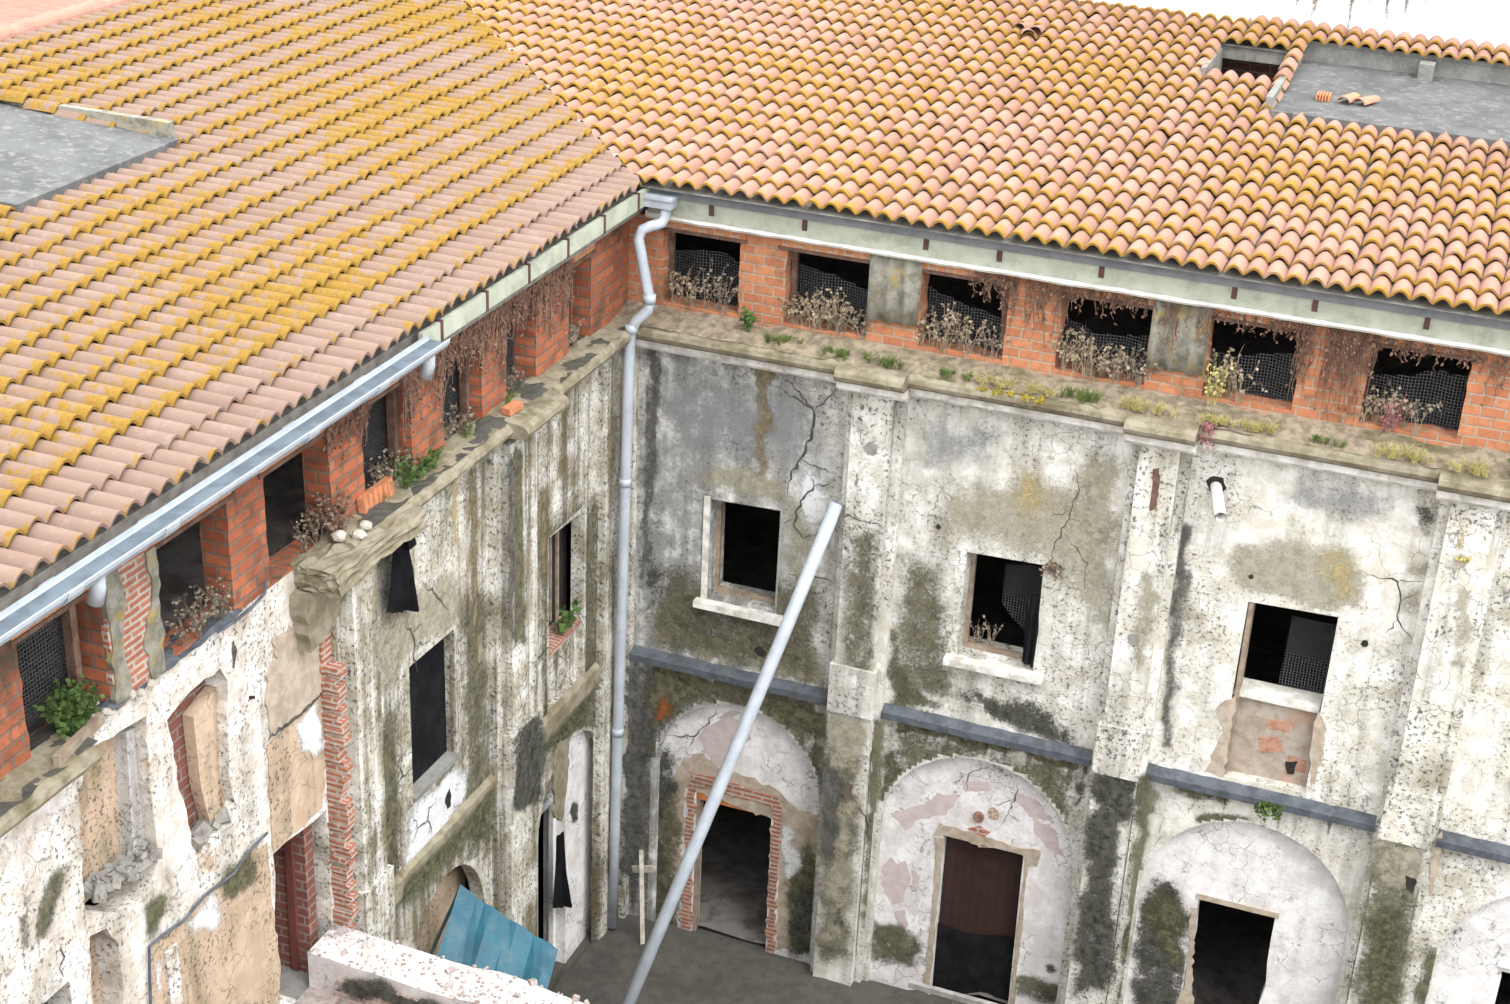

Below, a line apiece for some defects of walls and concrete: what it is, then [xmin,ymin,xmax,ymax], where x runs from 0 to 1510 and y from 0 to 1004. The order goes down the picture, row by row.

flaking render [249,587,346,777]
leakage [378,573,490,873]
leakage [638,349,828,680]
peeling [656,711,819,950]
crack [782,380,881,584]
leakage [843,534,876,671]
peeling [881,857,920,928]
peeling [891,780,992,830]
leakage [889,562,1191,1004]
crack [1050,470,1114,584]
flaking render [1258,711,1327,789]
leakage [1350,841,1419,1004]